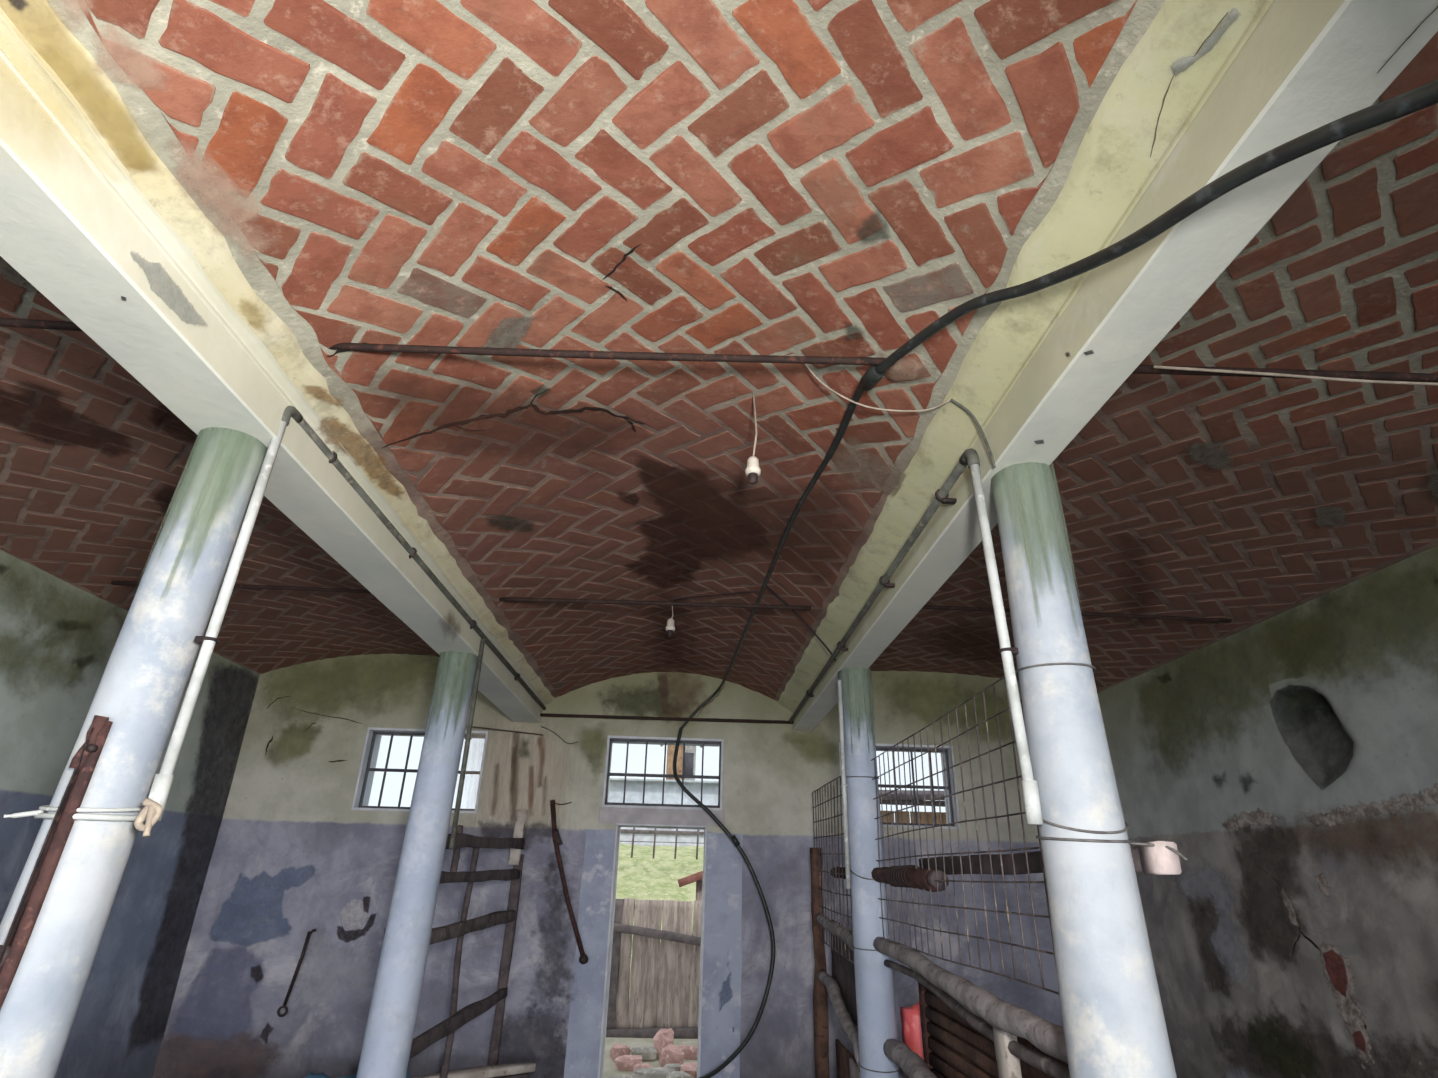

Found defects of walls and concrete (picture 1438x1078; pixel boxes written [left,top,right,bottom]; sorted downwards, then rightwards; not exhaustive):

water stain [0,383,129,455]
rust [307,386,403,496]
crack [382,388,645,448]
water stain [145,405,244,588]
water stain [620,460,768,586]
flaking render [1271,685,1353,790]
peeling [1307,784,1438,827]
peeling [176,866,314,1043]
flaking render [1320,943,1375,1064]